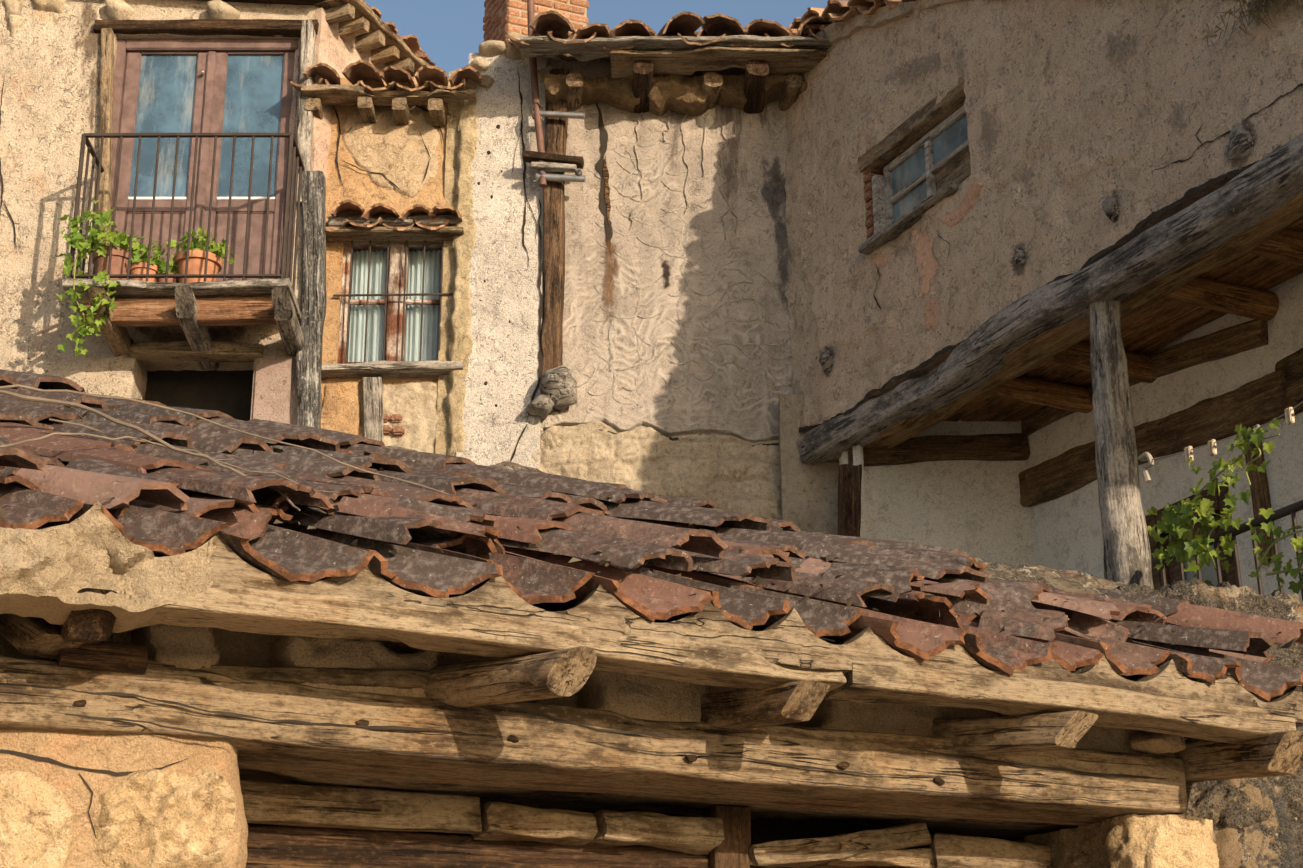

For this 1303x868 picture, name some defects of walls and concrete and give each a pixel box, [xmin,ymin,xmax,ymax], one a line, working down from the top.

crack [0,159,17,250]
crack [333,105,431,191]
crack [595,103,613,252]
damp [761,158,789,302]
spalling [912,225,940,331]
crack [0,749,188,838]